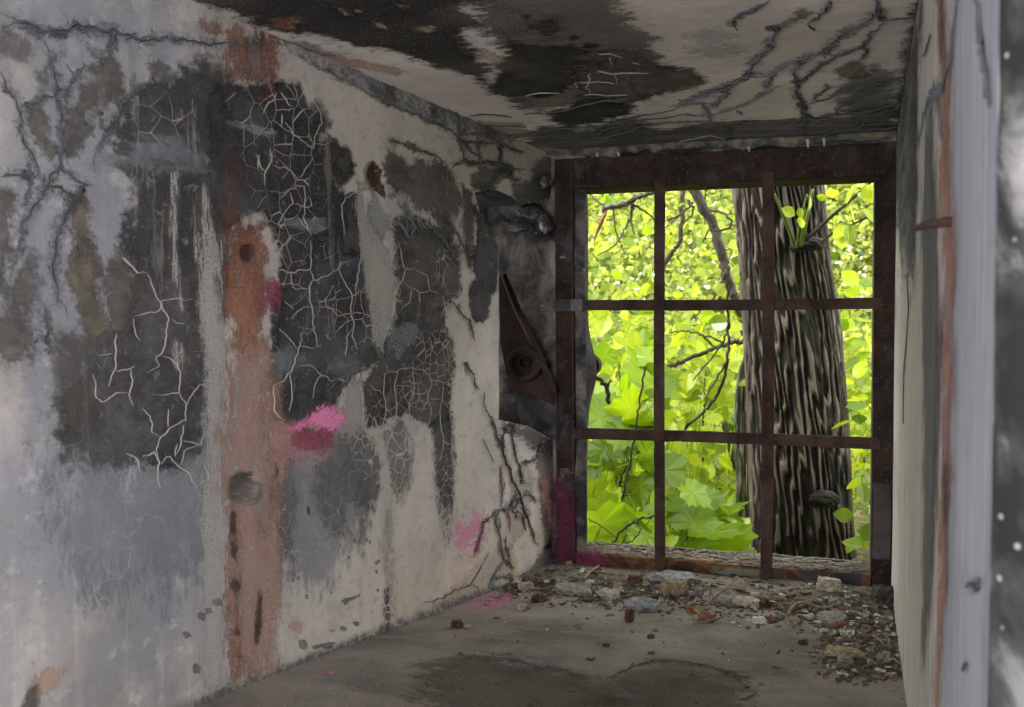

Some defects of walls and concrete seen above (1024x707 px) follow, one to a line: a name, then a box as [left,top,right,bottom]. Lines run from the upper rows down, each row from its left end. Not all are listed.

damp [194,0,706,126]
damp [0,187,39,362]
crack [93,258,244,489]
damp [26,47,463,690]
corrosion [221,214,270,360]
corrosion [367,161,385,199]
crack [256,92,543,603]
crack [0,0,991,360]
spalling [516,203,555,234]
crack [901,274,909,423]
corrosion [935,0,957,707]
corrosion [230,512,238,559]